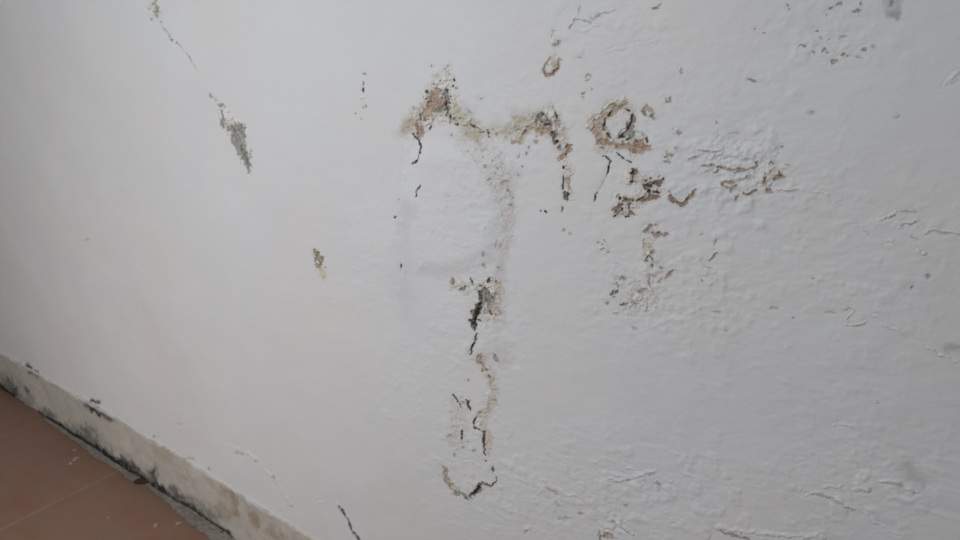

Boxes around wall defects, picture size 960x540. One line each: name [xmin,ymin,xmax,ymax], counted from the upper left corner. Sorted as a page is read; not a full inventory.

peeling [542,40,594,102]
peeling [208,92,254,177]
peeling [399,61,802,332]
peeling [311,247,335,301]
crack [445,331,501,472]
damp [0,383,232,537]
crack [315,498,362,540]